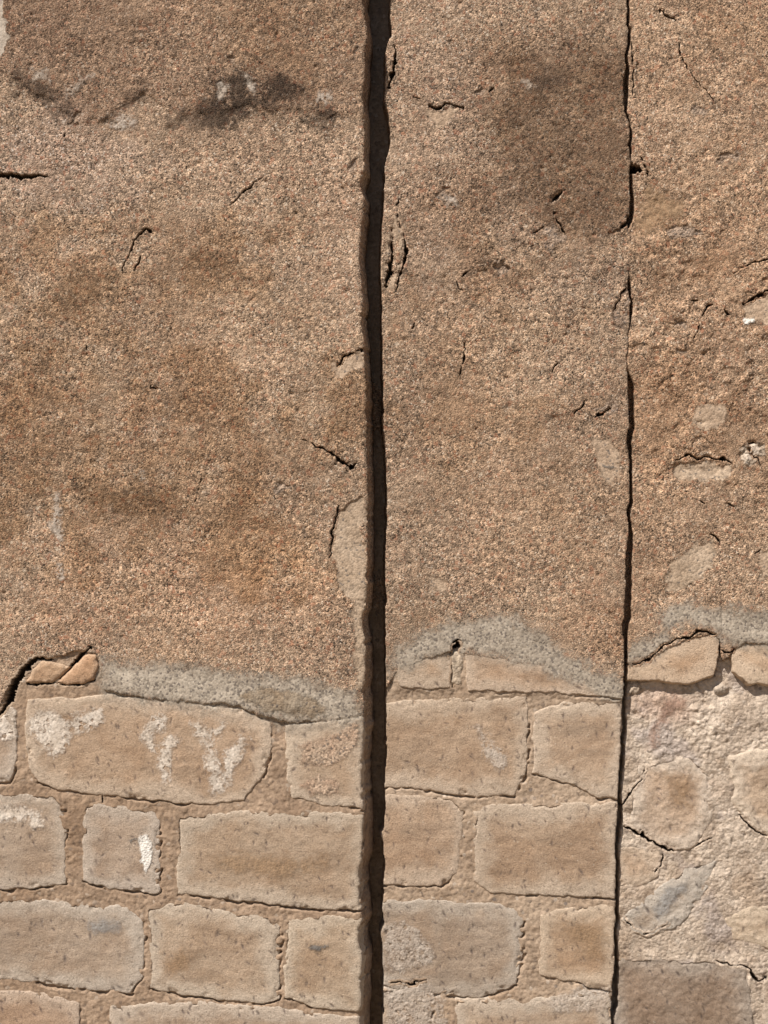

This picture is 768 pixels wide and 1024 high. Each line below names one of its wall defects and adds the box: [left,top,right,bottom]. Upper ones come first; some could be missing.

crack [0,169,48,183]
crack [382,192,412,291]
crack [300,437,358,473]
crack [674,439,762,465]
peeling [328,497,368,689]
water stain [384,613,623,702]
crack [624,627,736,668]
water stain [628,601,768,659]
water stain [0,708,103,756]
water stain [98,659,364,797]
crack [620,765,768,873]
water stain [130,834,152,872]